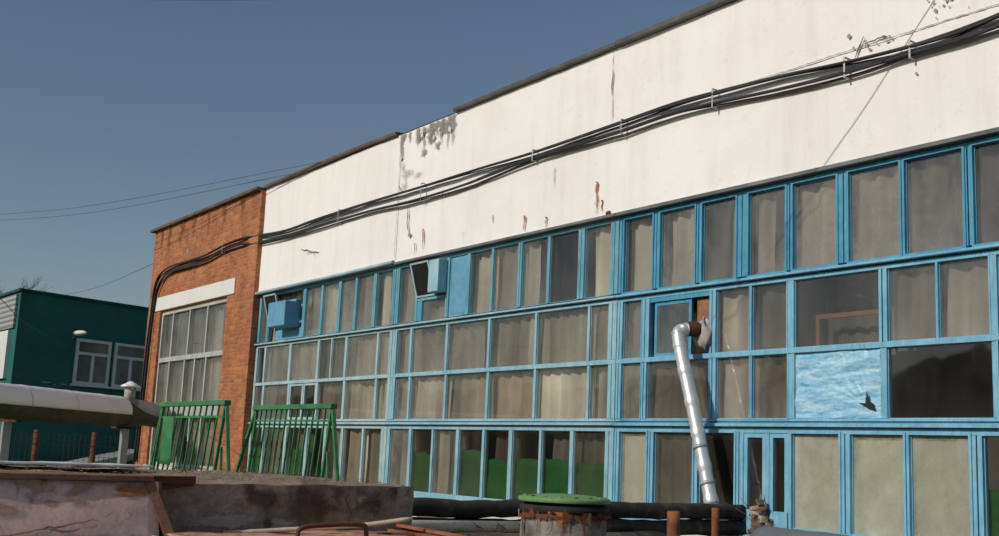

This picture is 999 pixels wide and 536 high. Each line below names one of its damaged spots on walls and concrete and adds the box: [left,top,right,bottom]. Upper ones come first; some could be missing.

peeling [400,113,456,188]